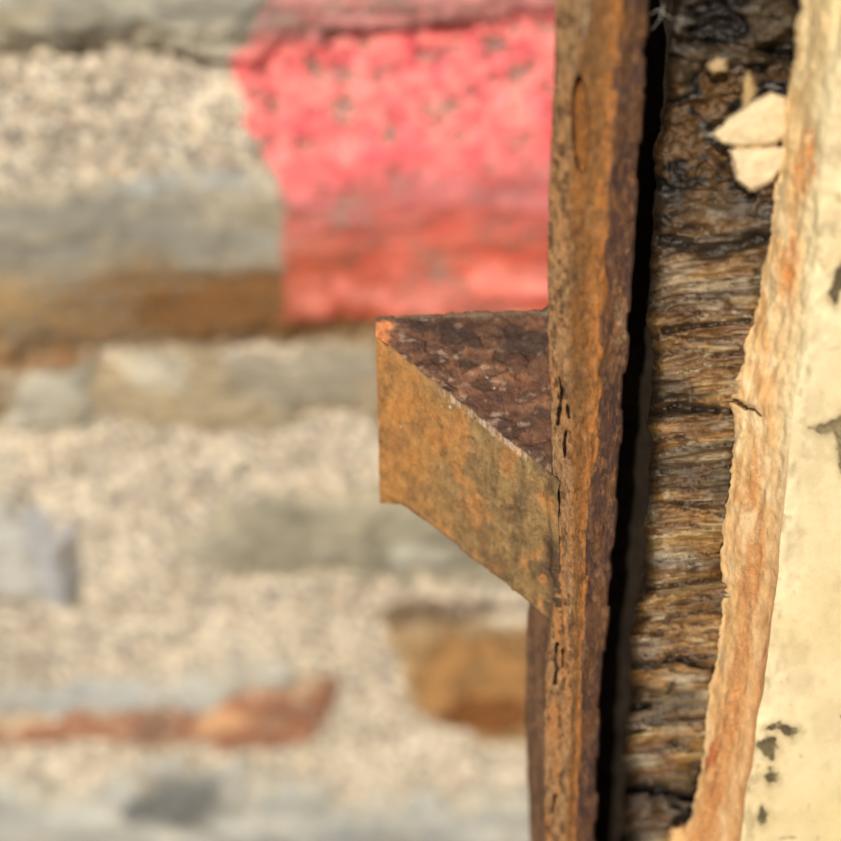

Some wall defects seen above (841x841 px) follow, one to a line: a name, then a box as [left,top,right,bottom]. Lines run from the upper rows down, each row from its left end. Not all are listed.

spalling [668,0,841,841]